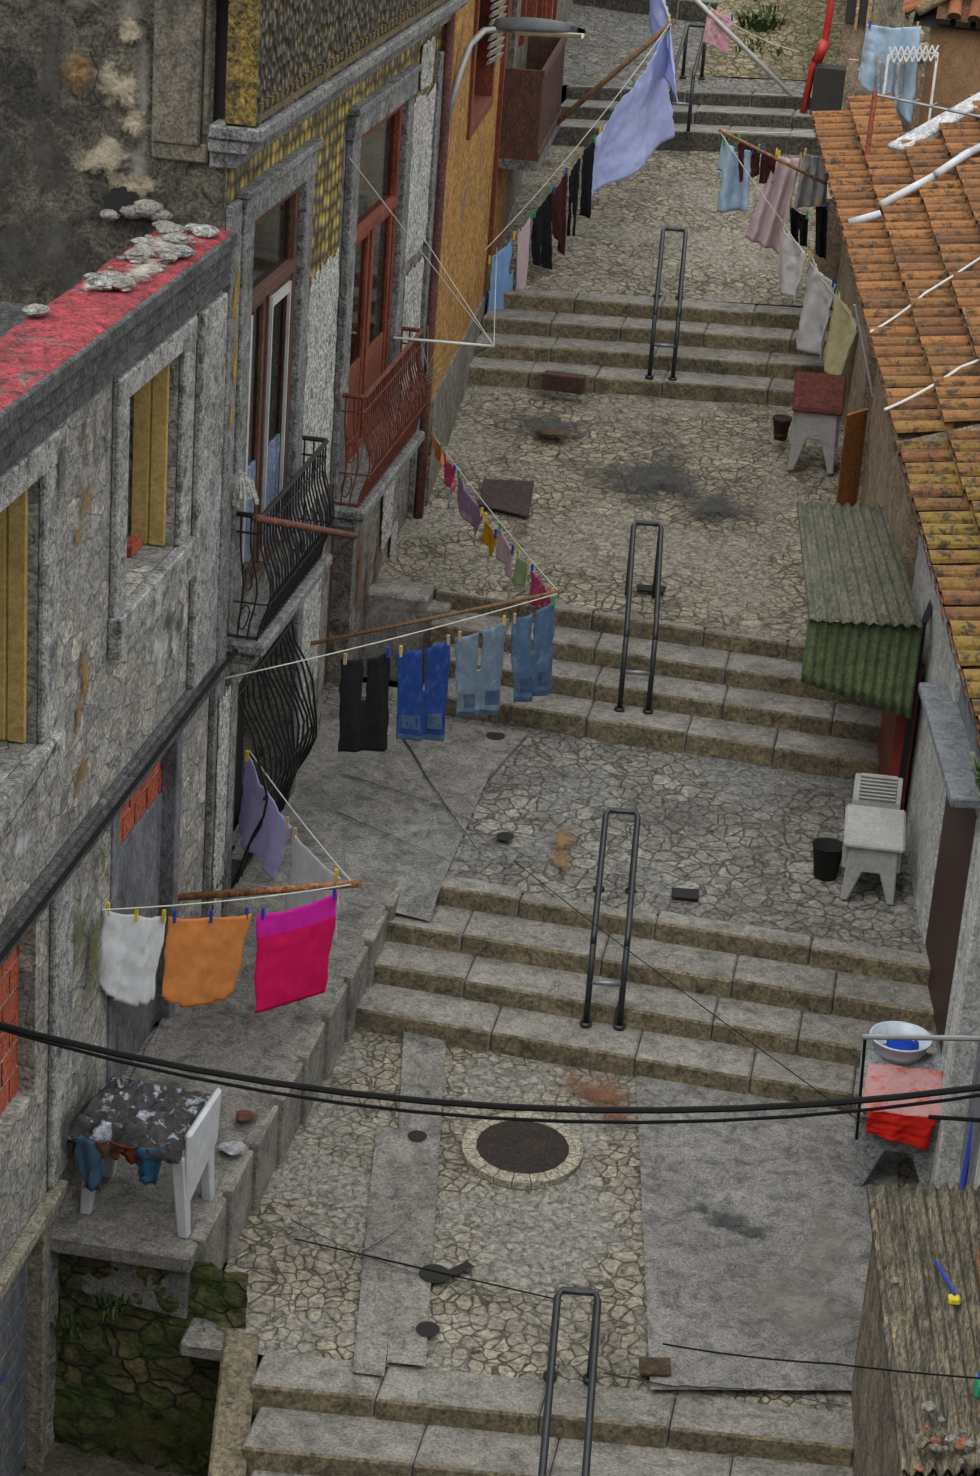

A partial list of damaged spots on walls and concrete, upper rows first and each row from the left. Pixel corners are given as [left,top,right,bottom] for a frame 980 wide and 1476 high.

flaking render [119,17,142,43]
spalling [73,62,180,277]